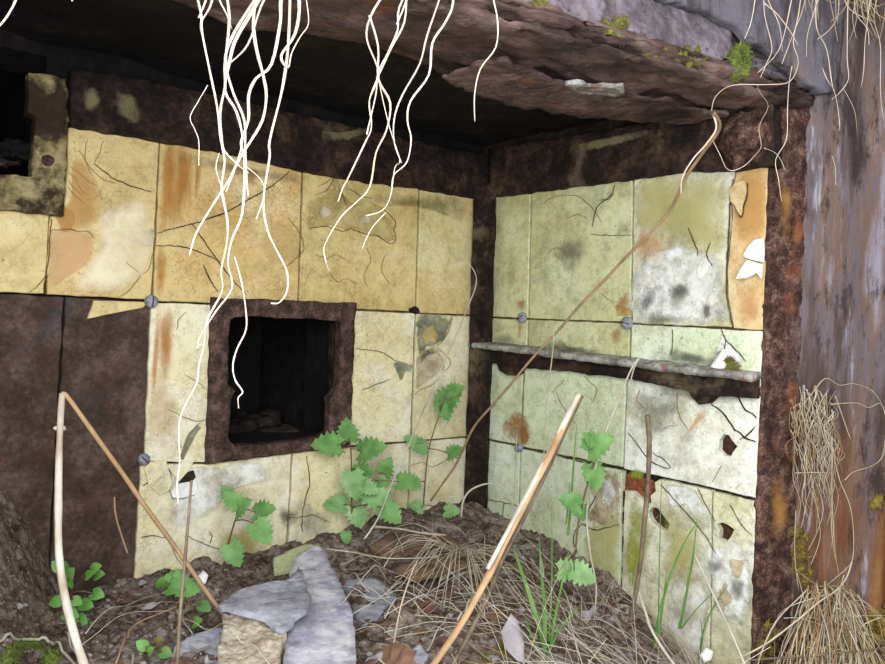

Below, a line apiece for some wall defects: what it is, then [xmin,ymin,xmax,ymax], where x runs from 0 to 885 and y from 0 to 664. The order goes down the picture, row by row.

rust [54,168,93,281]
crack [119,171,290,297]
crack [688,179,748,361]
peeling [736,237,765,279]
rust [154,330,168,373]
spalling [144,425,267,528]
rust [503,415,529,444]
spalling [584,470,709,529]
crack [629,433,754,554]
hole [722,435,737,455]
crack [711,397,757,442]
peeling [667,523,749,657]